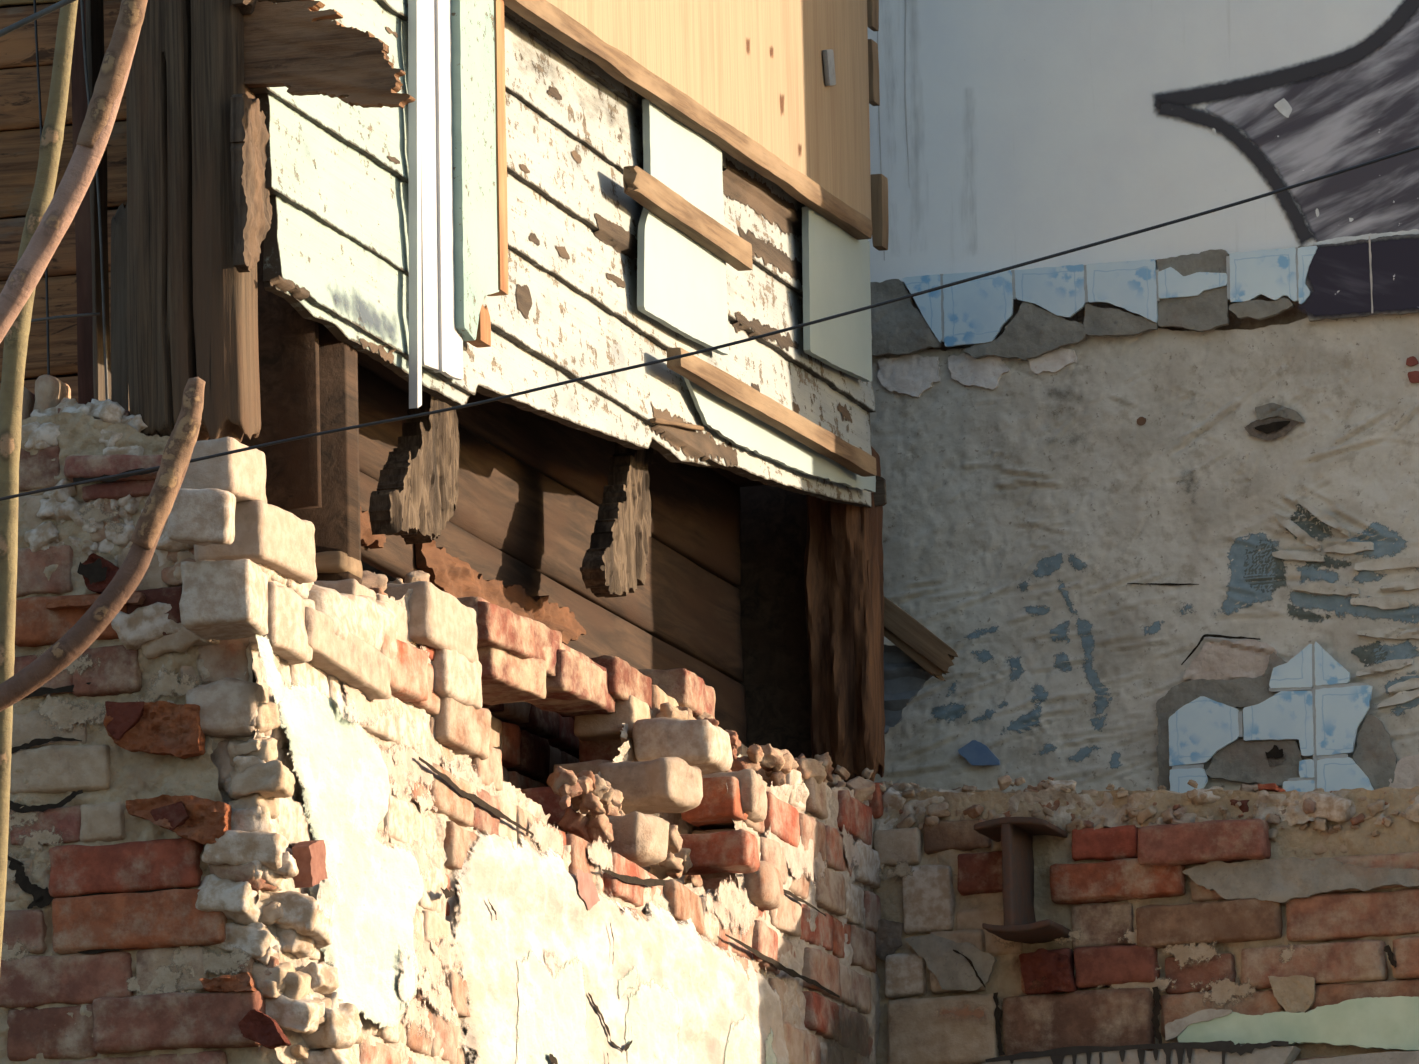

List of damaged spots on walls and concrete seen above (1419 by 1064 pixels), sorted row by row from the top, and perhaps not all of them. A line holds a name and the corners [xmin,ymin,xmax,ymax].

peeling [529,233,570,259]
peeling [594,213,638,260]
peeling [722,158,803,285]
peeling [516,284,532,319]
peeling [733,311,799,351]
flaking render [877,353,1010,398]
peeling [651,401,738,467]
peeling [1244,522,1419,716]
spalling [1181,634,1277,681]
spalling [103,701,205,759]
flaking render [256,635,424,1029]
flaking render [451,831,789,1064]